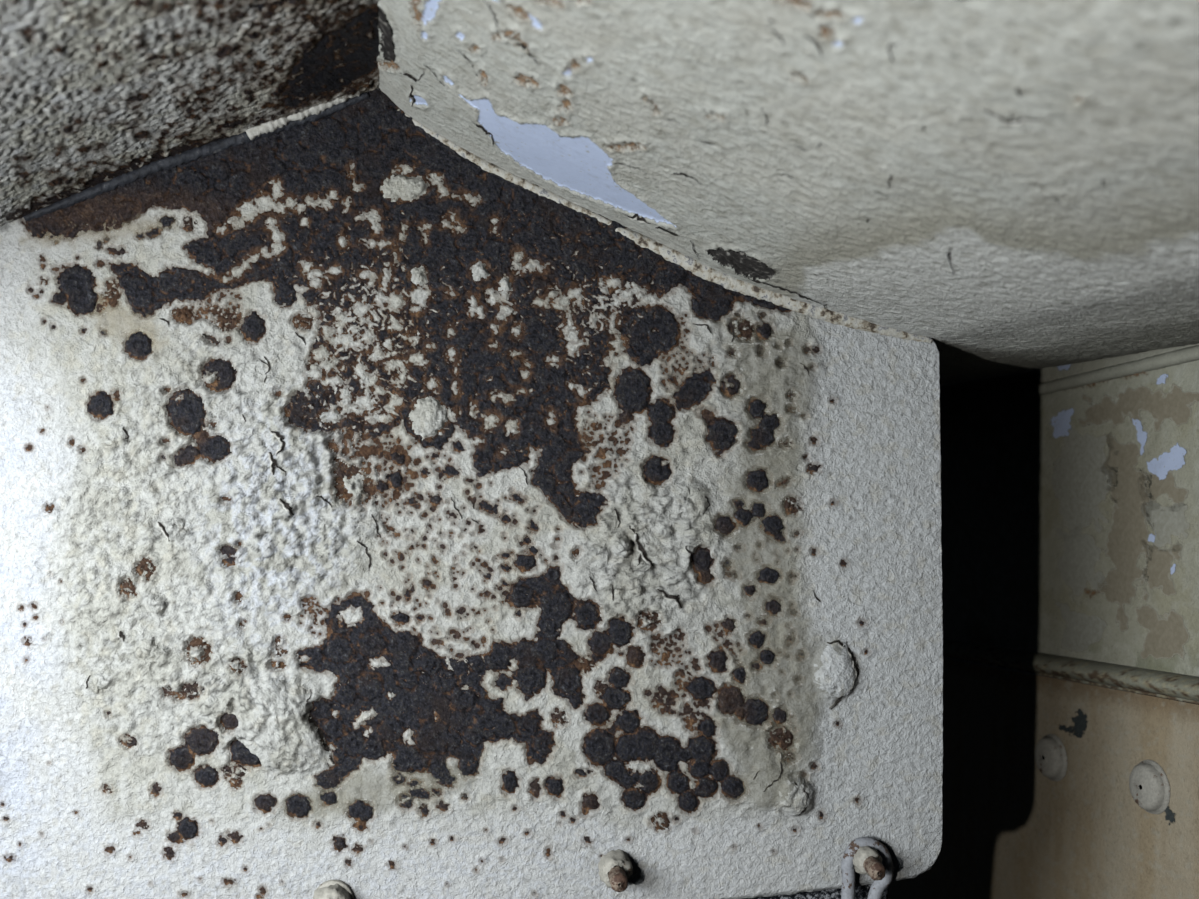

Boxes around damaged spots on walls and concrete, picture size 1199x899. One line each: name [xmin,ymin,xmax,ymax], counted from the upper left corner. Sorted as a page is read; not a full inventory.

rust [249,0,292,13]
peeling [421,0,441,40]
peeling [443,76,676,227]
rust [5,4,821,866]
peeling [1049,374,1199,659]
peeling [1059,709,1088,738]